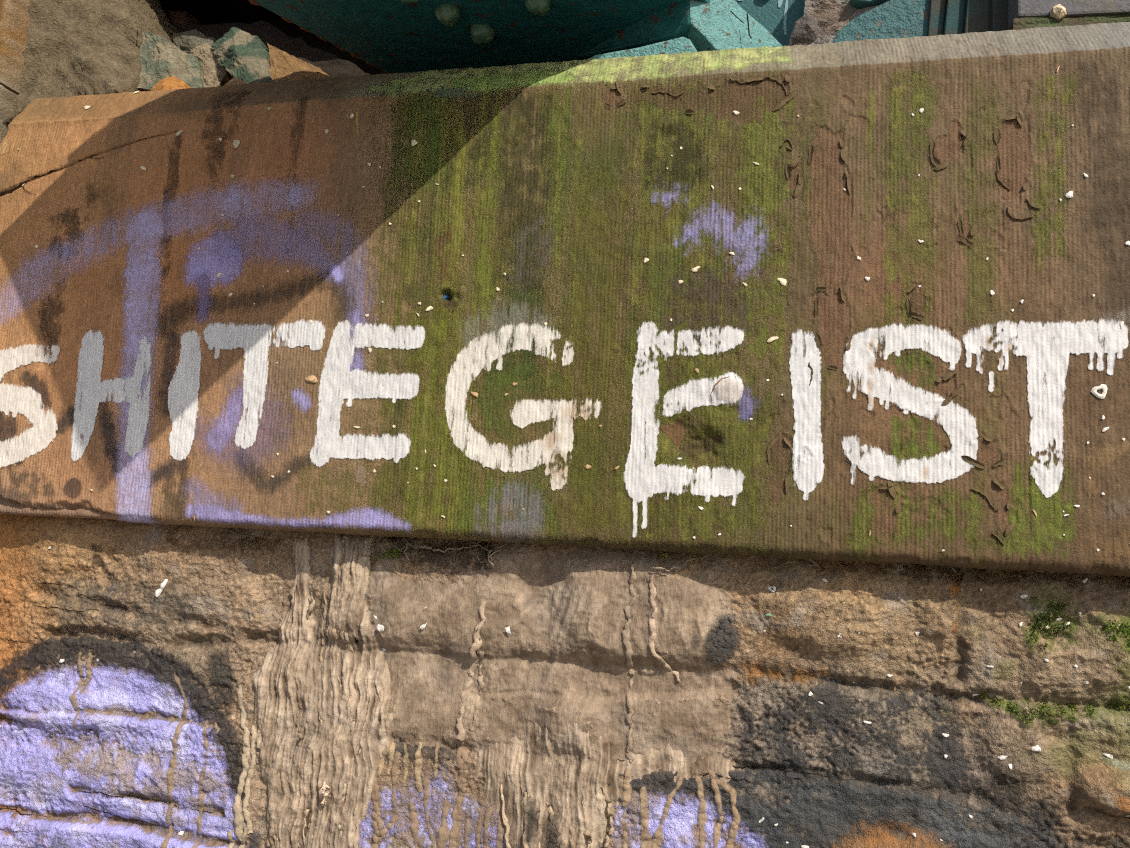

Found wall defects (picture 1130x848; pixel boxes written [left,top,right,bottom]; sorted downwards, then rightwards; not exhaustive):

crack [0,131,176,195]
peeling [994,113,1041,221]
water stain [663,268,754,338]
water stain [391,537,494,577]
water stain [371,735,503,848]
water stain [606,762,741,848]